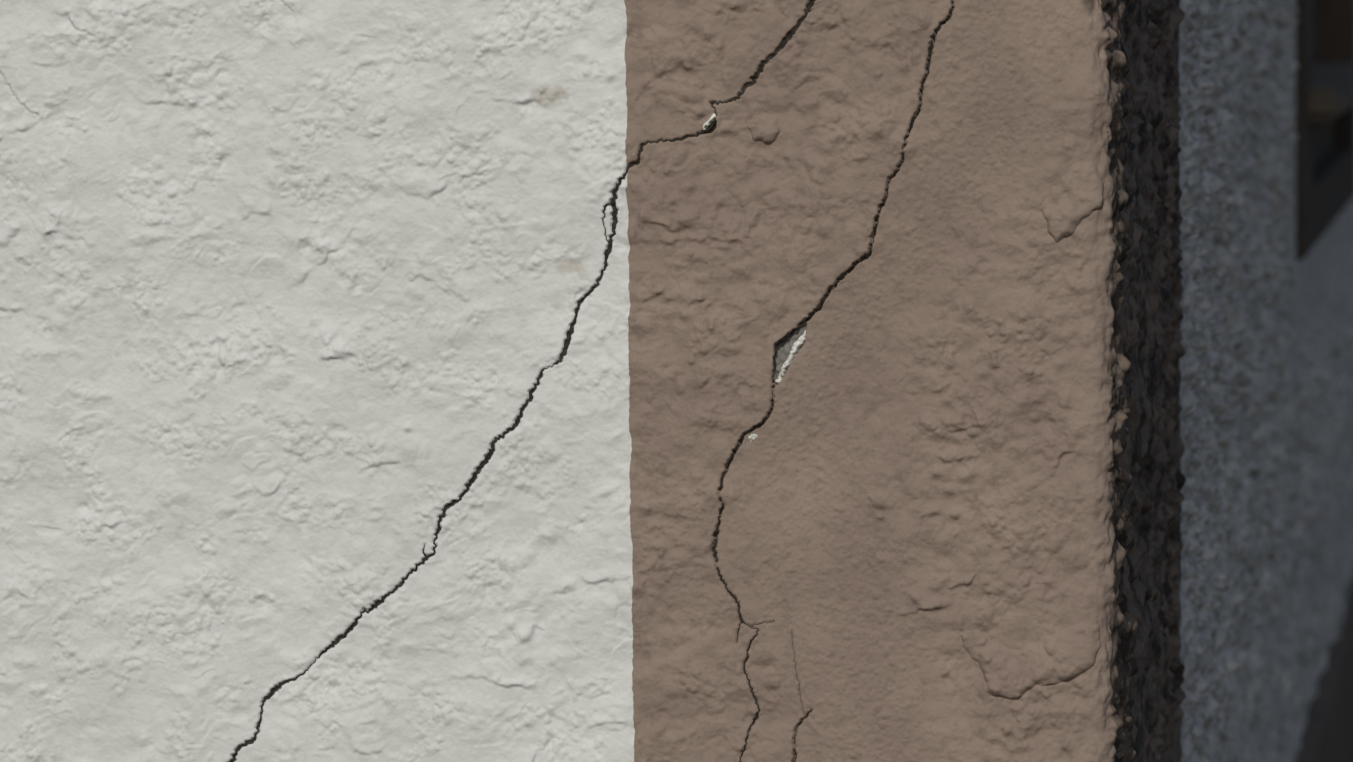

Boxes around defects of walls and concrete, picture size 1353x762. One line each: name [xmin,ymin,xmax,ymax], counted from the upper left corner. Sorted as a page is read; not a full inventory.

crack [230,0,815,762]
spalling [775,323,807,384]
crack [712,1,954,762]